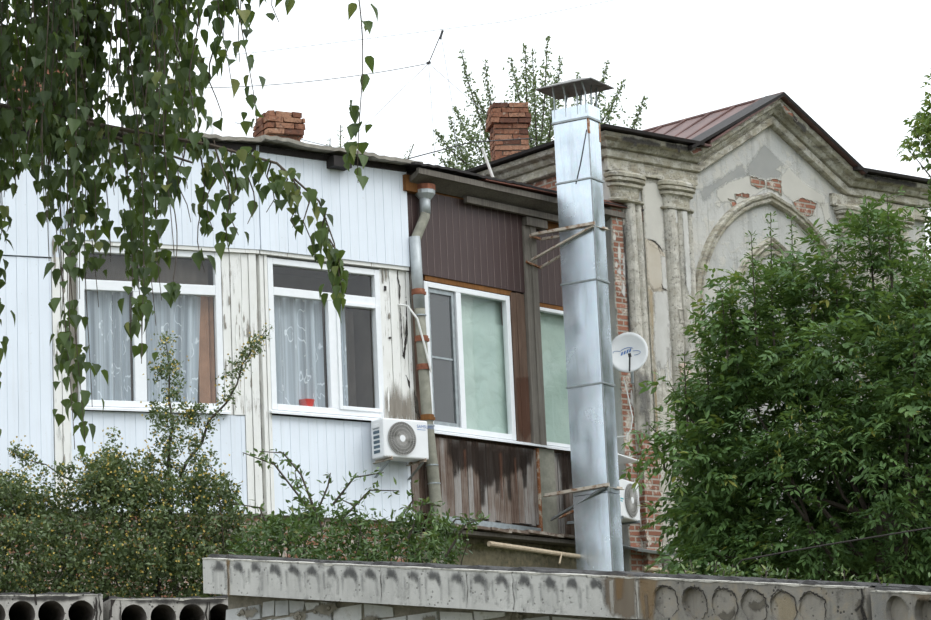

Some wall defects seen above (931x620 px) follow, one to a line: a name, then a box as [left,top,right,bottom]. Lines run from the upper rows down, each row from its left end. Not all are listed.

peeling [716,166,830,222]
spalling [610,207,631,336]
leakage [448,440,533,505]
leakage [558,453,572,509]
spalling [619,371,664,573]
leakage [270,565,316,575]
leakage [328,567,374,580]
leakage [474,575,507,586]
leakage [591,575,636,619]